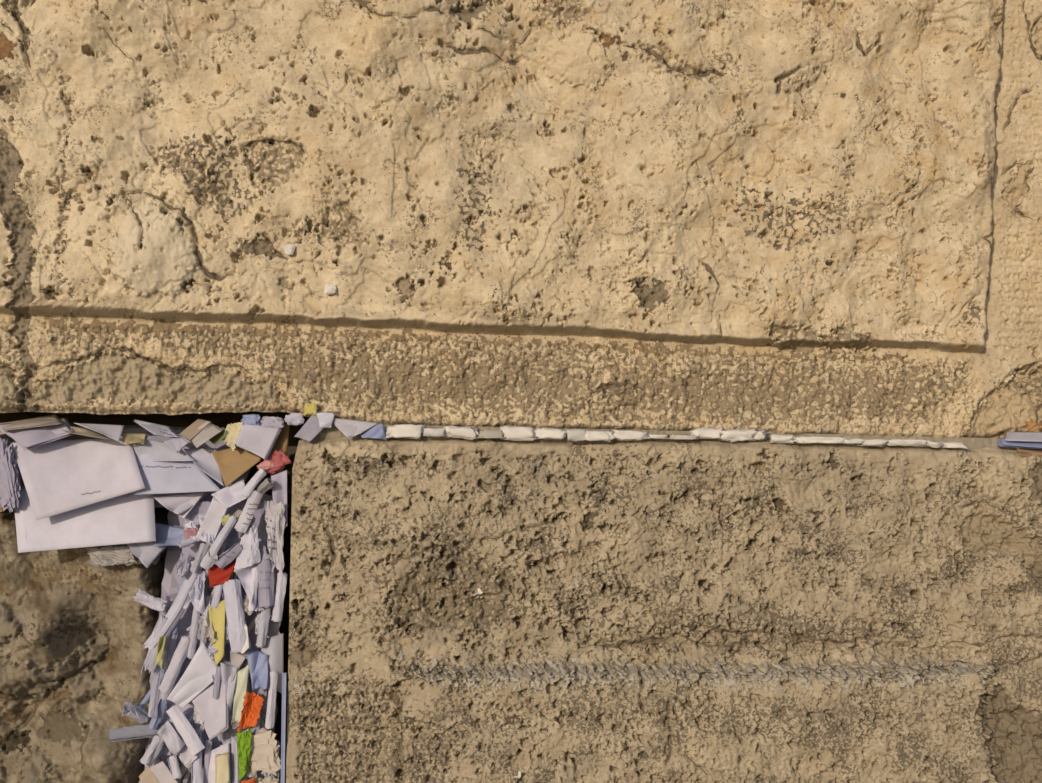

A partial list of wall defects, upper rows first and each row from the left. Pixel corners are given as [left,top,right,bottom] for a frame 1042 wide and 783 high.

crack [1,0,36,68]
crack [96,0,139,71]
crack [355,0,534,65]
crack [623,45,726,77]
crack [243,139,304,185]
crack [0,69,252,412]
crack [260,235,288,260]